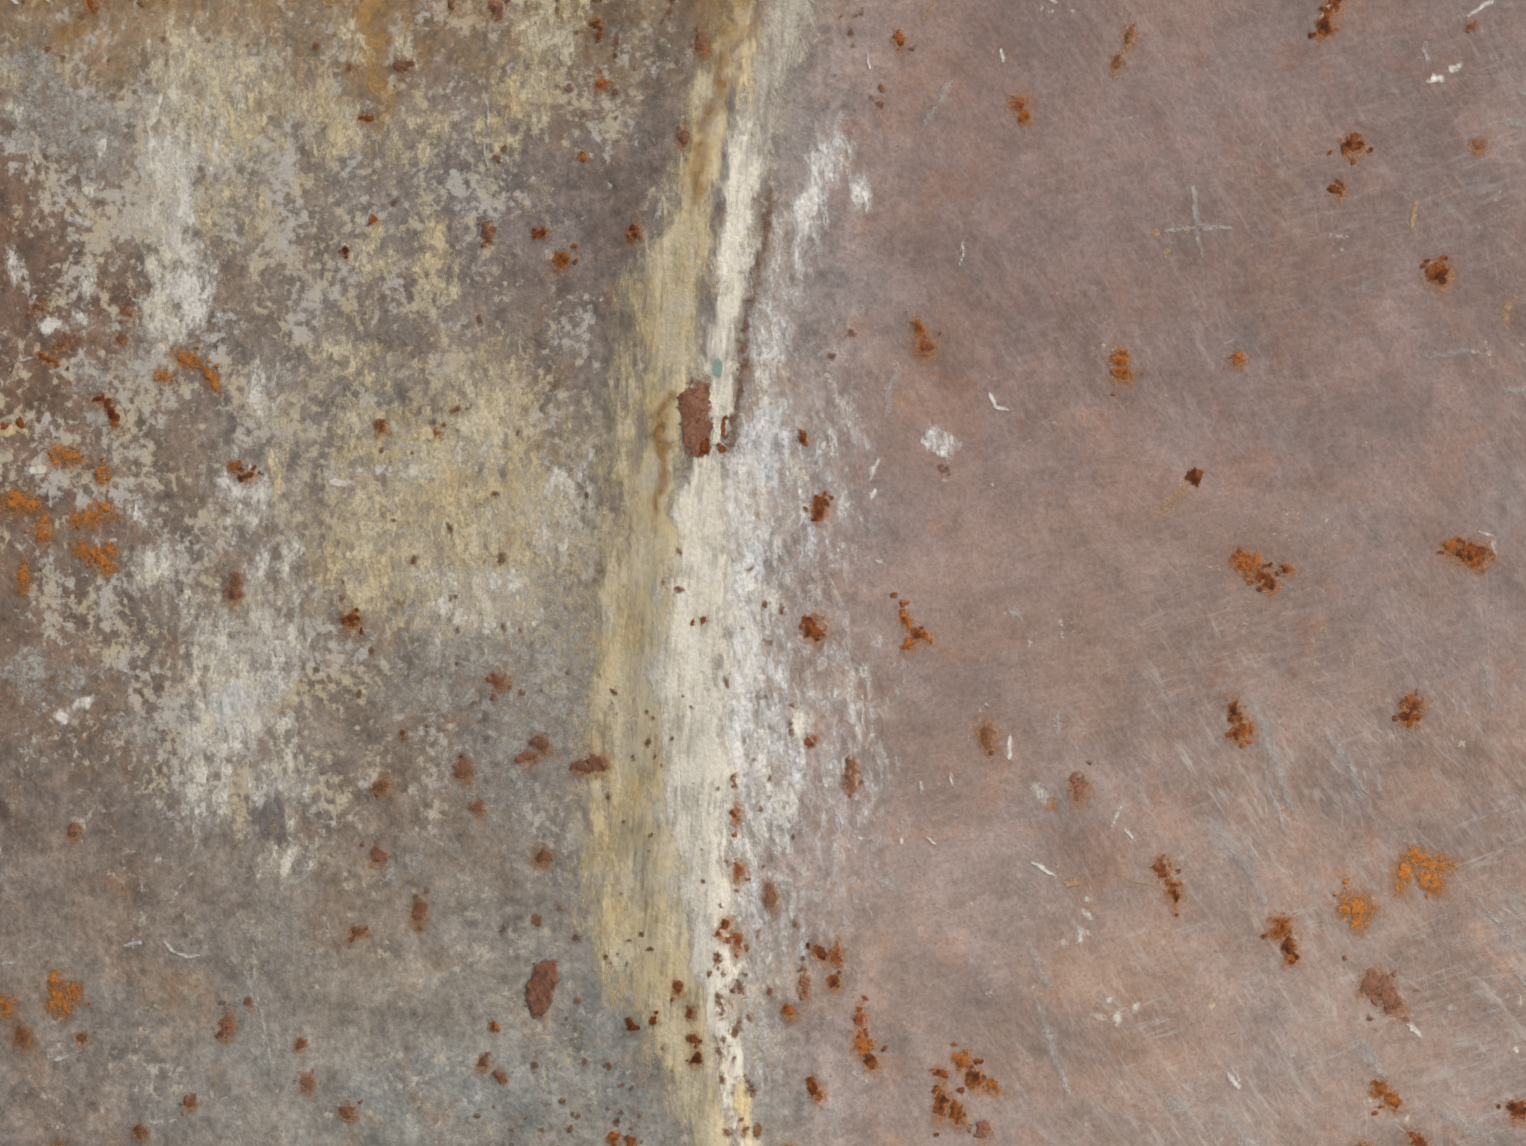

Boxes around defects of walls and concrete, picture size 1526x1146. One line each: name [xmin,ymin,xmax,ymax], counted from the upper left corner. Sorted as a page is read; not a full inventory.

peeling [473,0,607,164]
peeling [0,9,464,428]
peeling [0,419,28,437]
peeling [28,464,48,474]
rust [0,444,118,576]
peeling [123,237,658,995]
peeling [0,643,97,725]
rust [524,959,561,1020]
rust [781,942,844,1022]
rust [848,995,888,1072]
rust [929,1042,1000,1138]
rust [1497,1100,1526,1121]